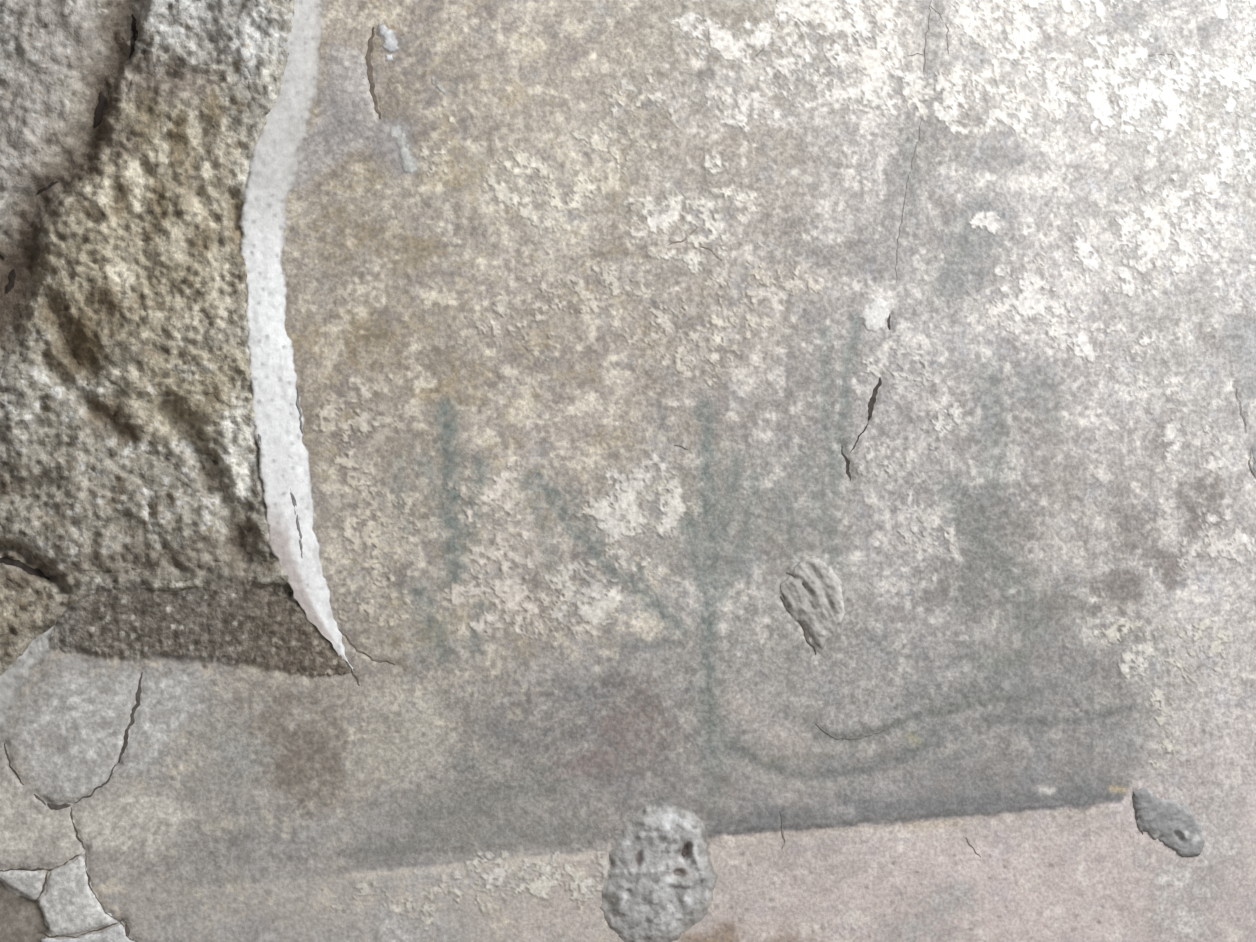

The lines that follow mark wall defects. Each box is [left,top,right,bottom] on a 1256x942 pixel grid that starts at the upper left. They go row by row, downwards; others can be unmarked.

spalling [0,0,295,676]
crack [841,377,882,481]
crack [1234,385,1256,477]
spalling [0,657,205,942]